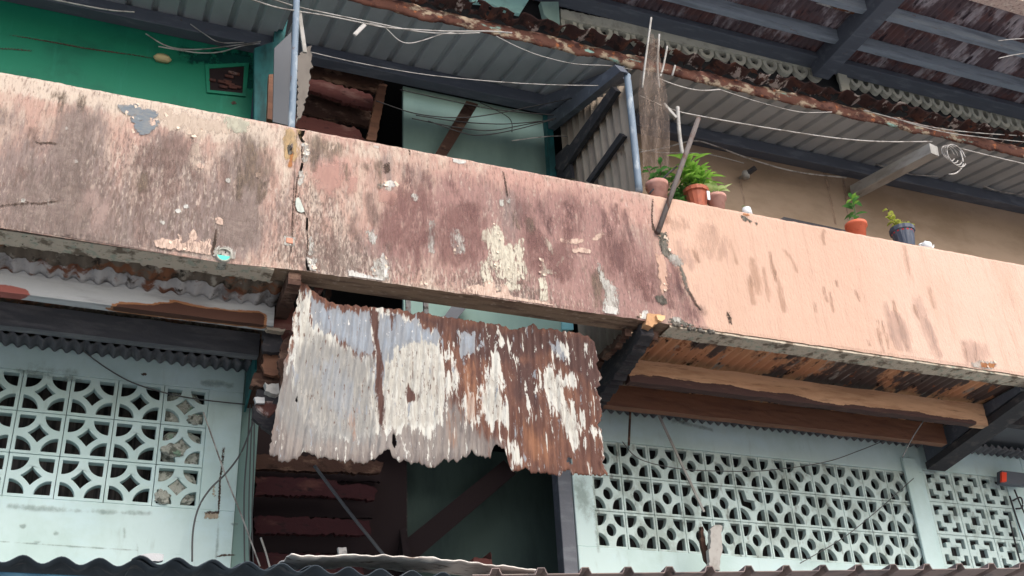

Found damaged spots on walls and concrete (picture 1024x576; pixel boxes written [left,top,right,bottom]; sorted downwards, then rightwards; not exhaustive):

peeling [117,103,232,170]
peeling [154,229,212,255]
crack [291,130,310,271]
peeling [451,228,465,255]
peeling [462,223,619,315]
crack [651,199,702,311]